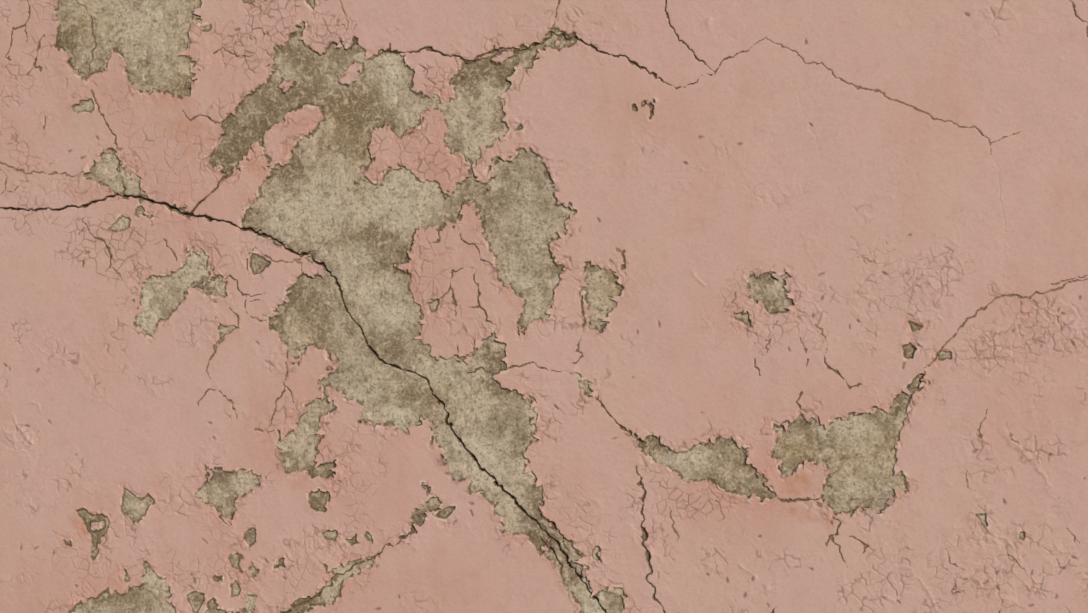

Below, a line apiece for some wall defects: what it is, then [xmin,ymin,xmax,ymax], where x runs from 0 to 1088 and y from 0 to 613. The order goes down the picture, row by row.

crack [212,0,1020,155]
crack [1069,0,1088,38]
peeling [48,0,628,613]
crack [0,0,746,613]
peeling [731,266,796,329]
crack [713,264,862,413]
peeling [632,317,954,518]
crack [924,275,1088,438]
crack [771,486,869,563]
crack [945,548,965,595]